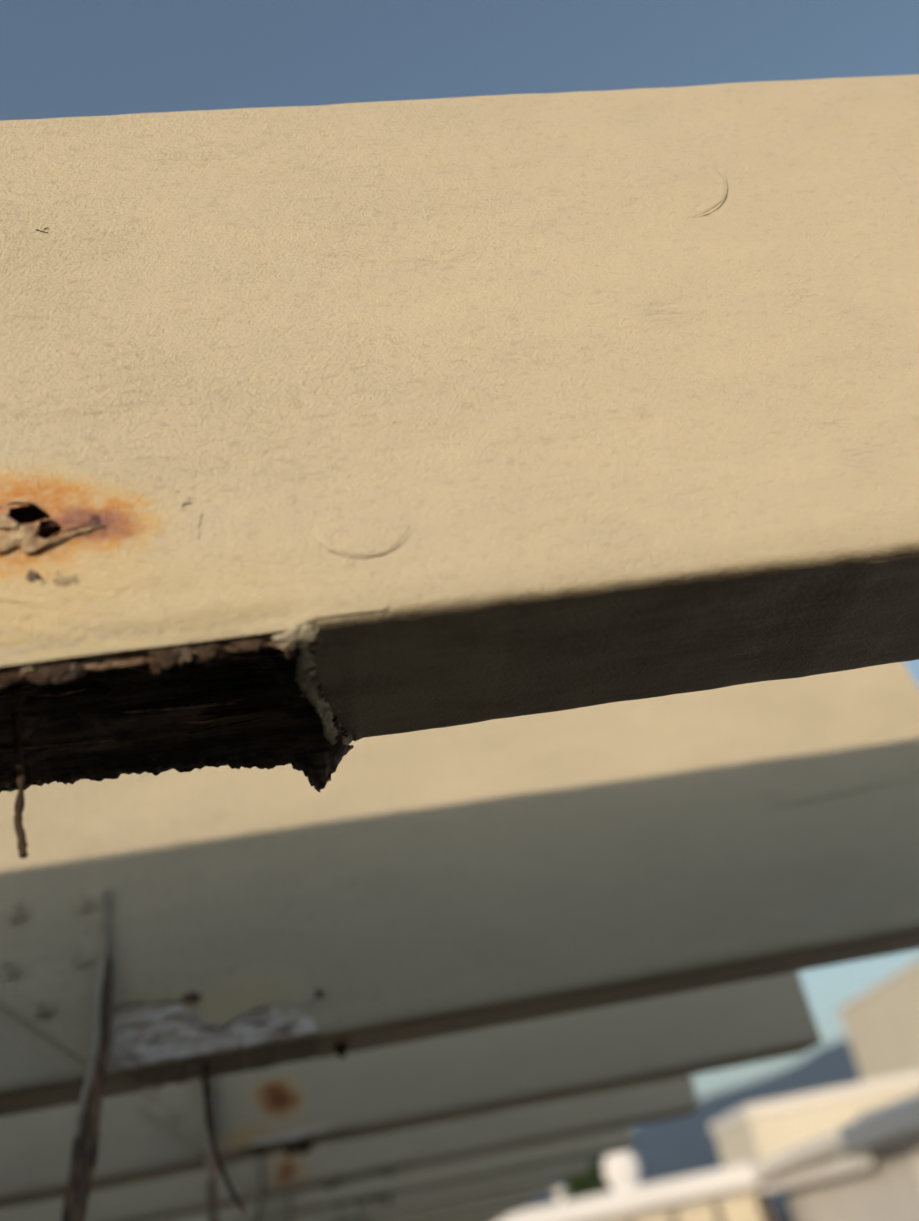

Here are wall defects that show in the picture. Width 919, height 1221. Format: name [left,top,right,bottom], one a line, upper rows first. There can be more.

rust [0,455,213,617]
peeling [272,624,348,745]
peeling [111,990,317,1068]
rust [244,1068,310,1134]